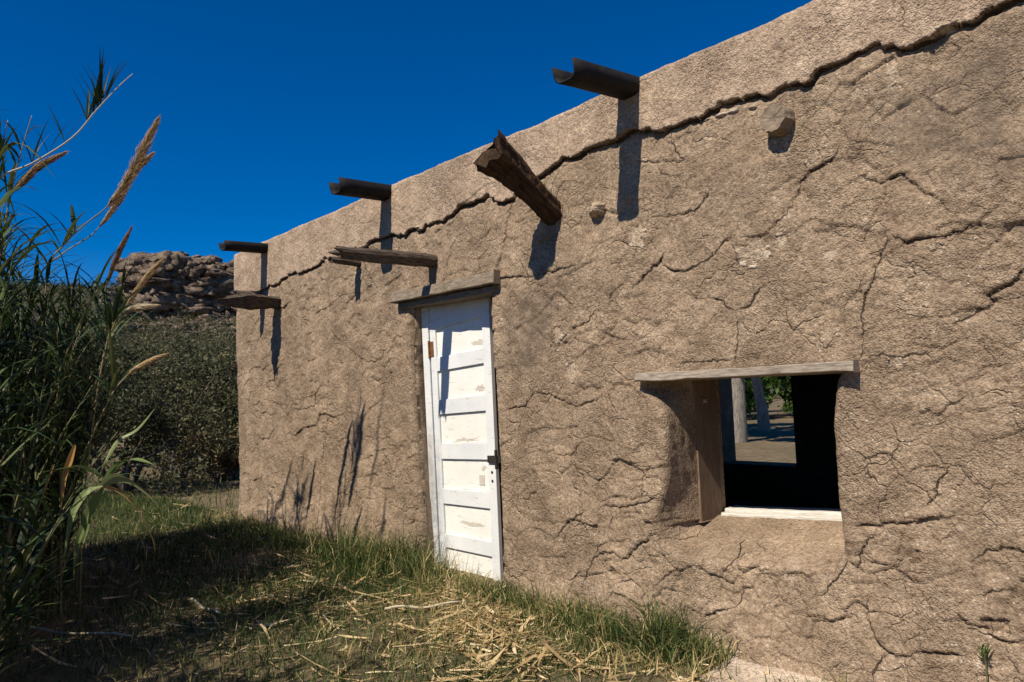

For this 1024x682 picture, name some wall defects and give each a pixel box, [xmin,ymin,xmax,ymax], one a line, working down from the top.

crack [637,129,685,178]
crack [995,155,1024,163]
crack [496,198,578,279]
crack [634,140,895,285]
crack [842,173,1022,367]
crack [684,286,763,363]
crack [505,392,599,410]
crack [535,497,700,612]
crack [704,538,746,617]
crack [825,453,1015,593]
crack [969,546,1024,563]
crack [866,596,963,682]